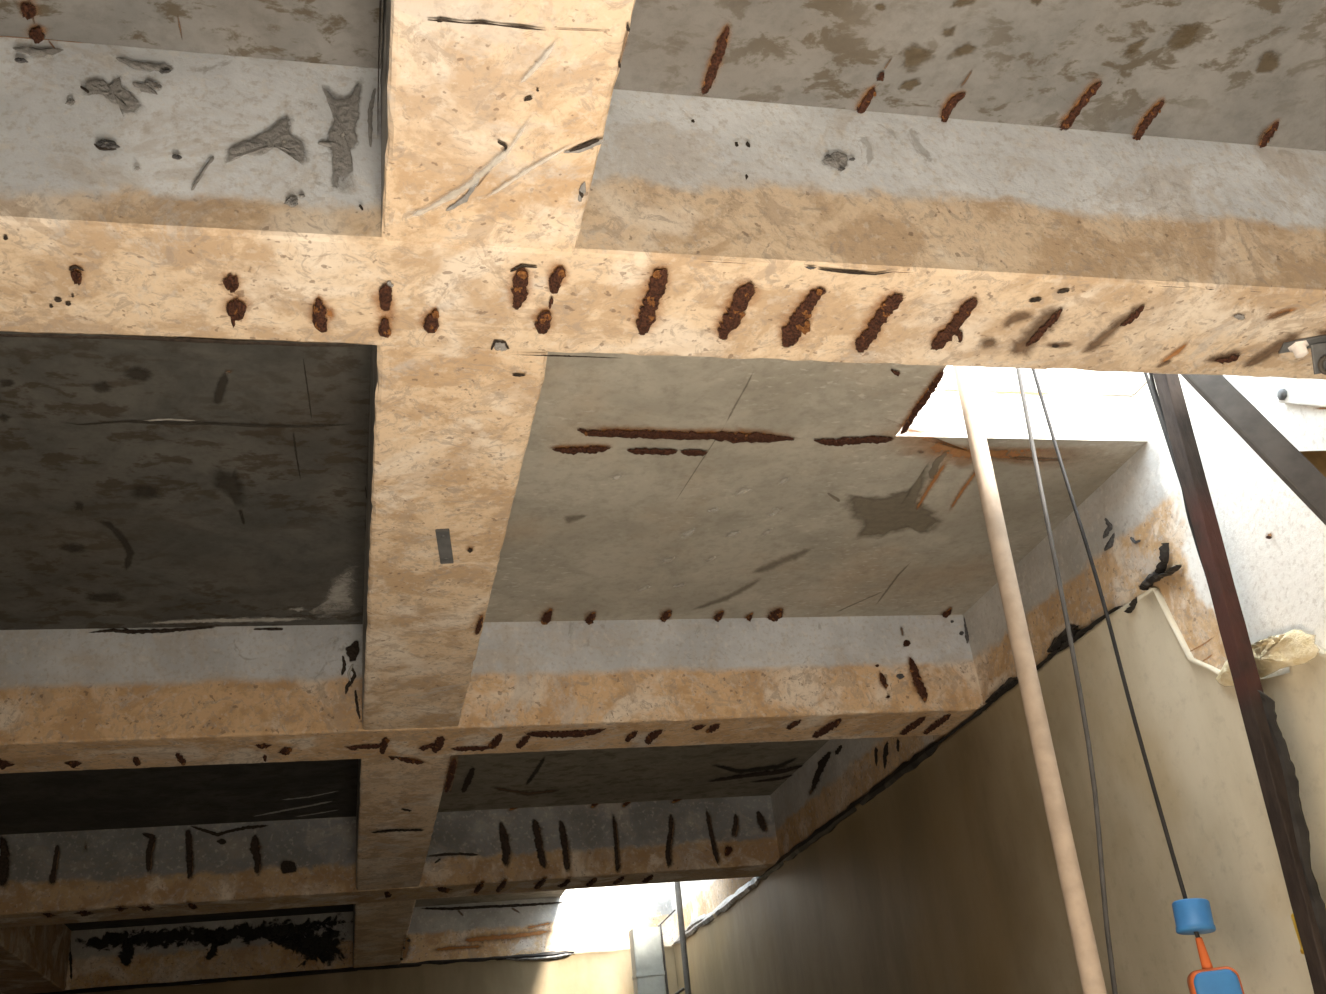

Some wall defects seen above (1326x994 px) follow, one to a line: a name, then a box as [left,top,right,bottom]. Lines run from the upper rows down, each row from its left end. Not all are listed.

crack [428,18,598,31]
peeling [66,57,173,113]
peeling [94,139,120,151]
peeling [191,84,376,190]
crack [563,139,604,153]
crack [446,141,507,211]
rust [510,265,566,334]
rust [636,269,668,335]
rust [717,281,756,340]
rust [781,288,826,348]
rust [931,298,978,351]
rust [552,428,794,456]